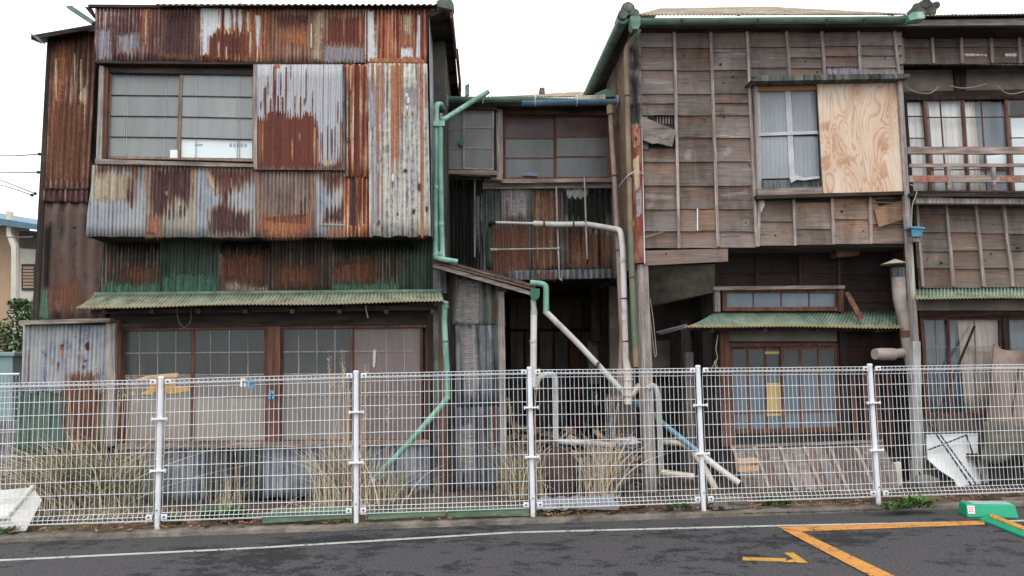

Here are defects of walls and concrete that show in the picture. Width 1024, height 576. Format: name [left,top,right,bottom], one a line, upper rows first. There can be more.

rust [50,43,86,157]
rust [93,9,428,239]
rust [220,250,271,291]
rust [488,191,610,280]